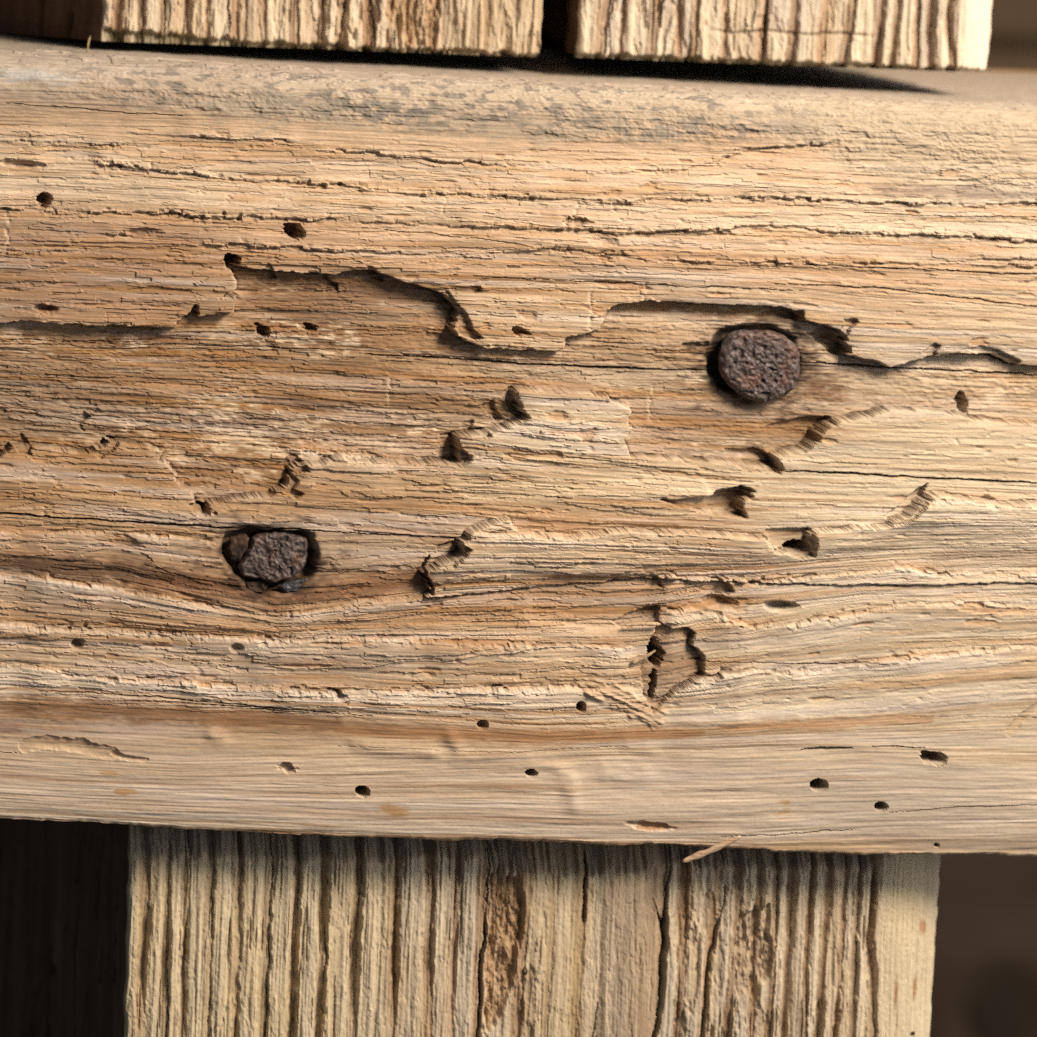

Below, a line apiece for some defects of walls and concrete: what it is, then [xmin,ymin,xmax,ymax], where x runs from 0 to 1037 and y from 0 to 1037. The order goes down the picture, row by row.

corrosion [155,498,369,632]
crack [744,452,1037,485]
crack [475,840,491,1037]
crack [651,844,673,1037]